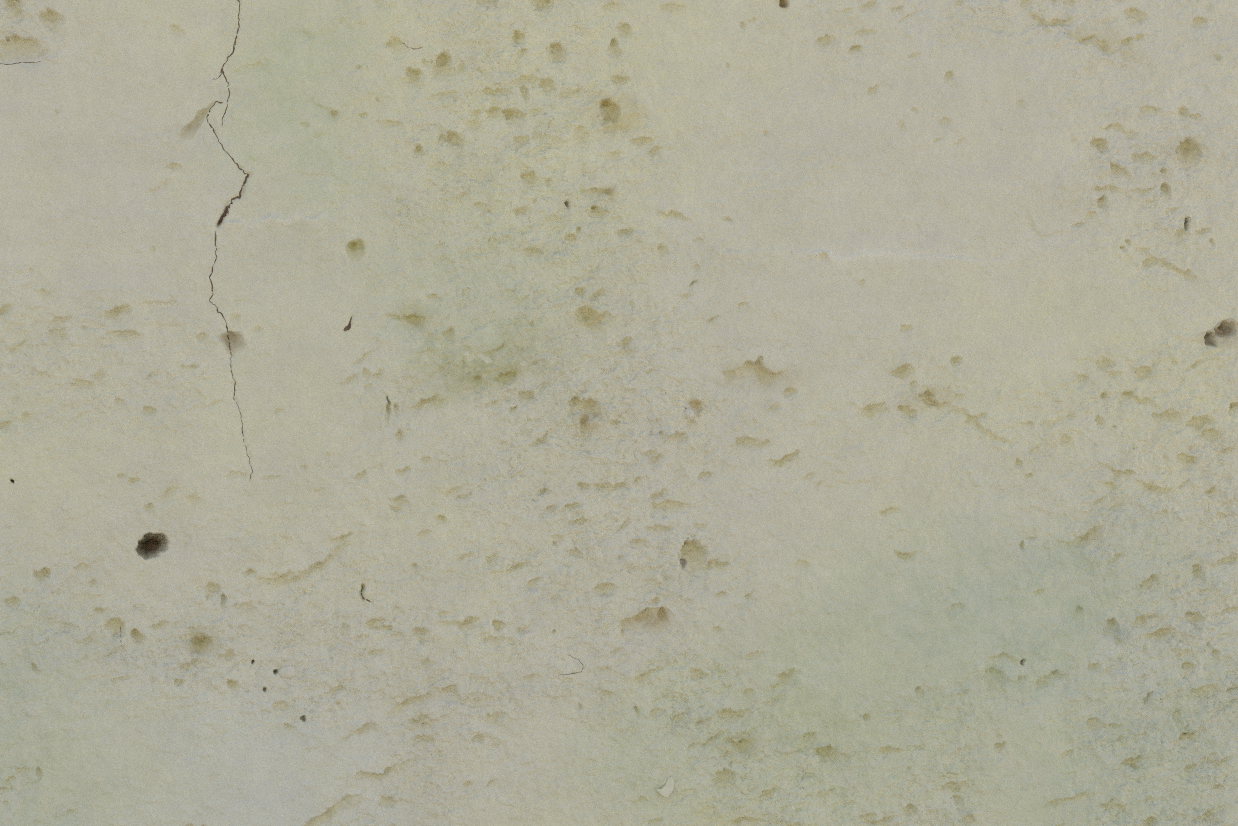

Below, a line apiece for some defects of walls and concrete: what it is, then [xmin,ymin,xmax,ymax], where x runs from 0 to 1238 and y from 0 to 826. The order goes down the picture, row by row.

crack [207,0,253,479]